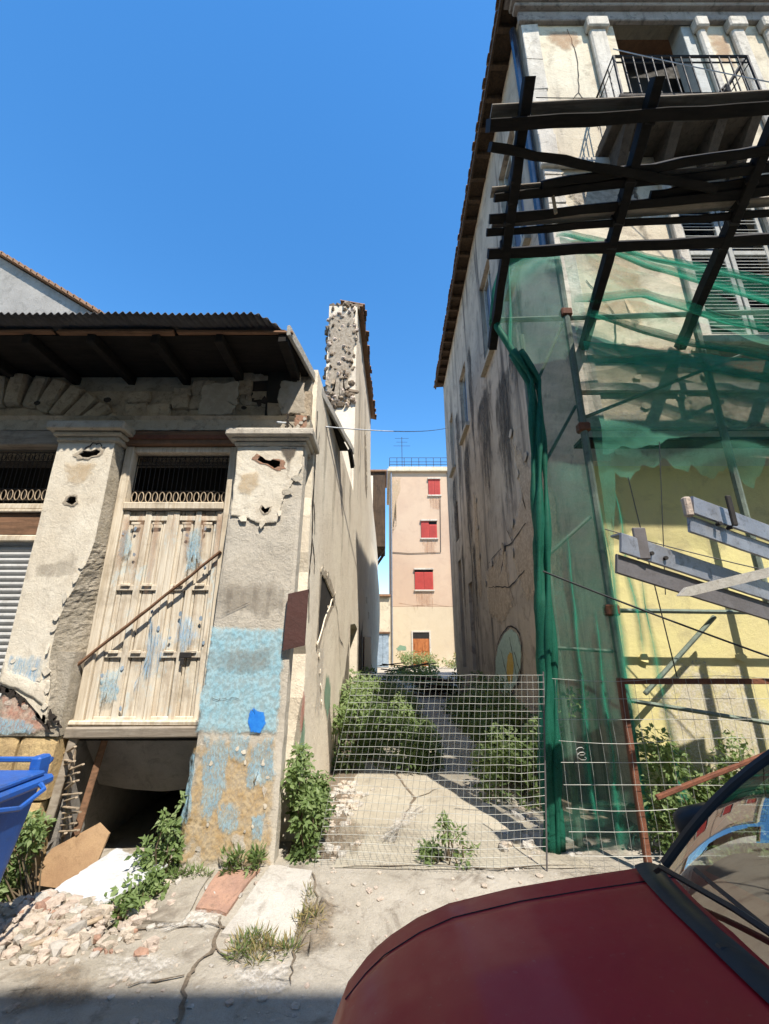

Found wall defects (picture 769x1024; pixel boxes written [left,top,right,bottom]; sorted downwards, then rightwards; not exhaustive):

crack [567,29,583,98]
hole [62,494,78,506]
hole [73,443,105,460]
flaking render [231,446,303,528]
leakage [453,294,519,633]
spalling [0,541,107,735]
crack [466,478,526,677]
peeling [181,733,275,868]